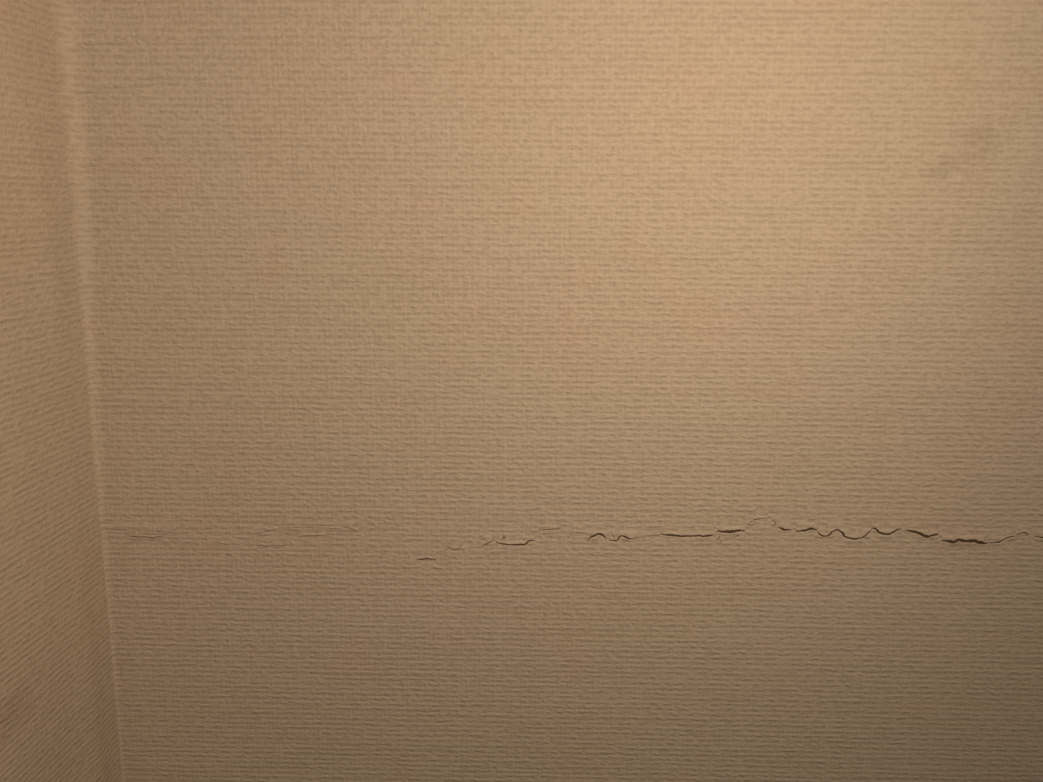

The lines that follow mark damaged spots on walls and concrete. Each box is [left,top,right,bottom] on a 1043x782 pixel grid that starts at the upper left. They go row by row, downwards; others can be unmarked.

crack [415,511,1043,565]